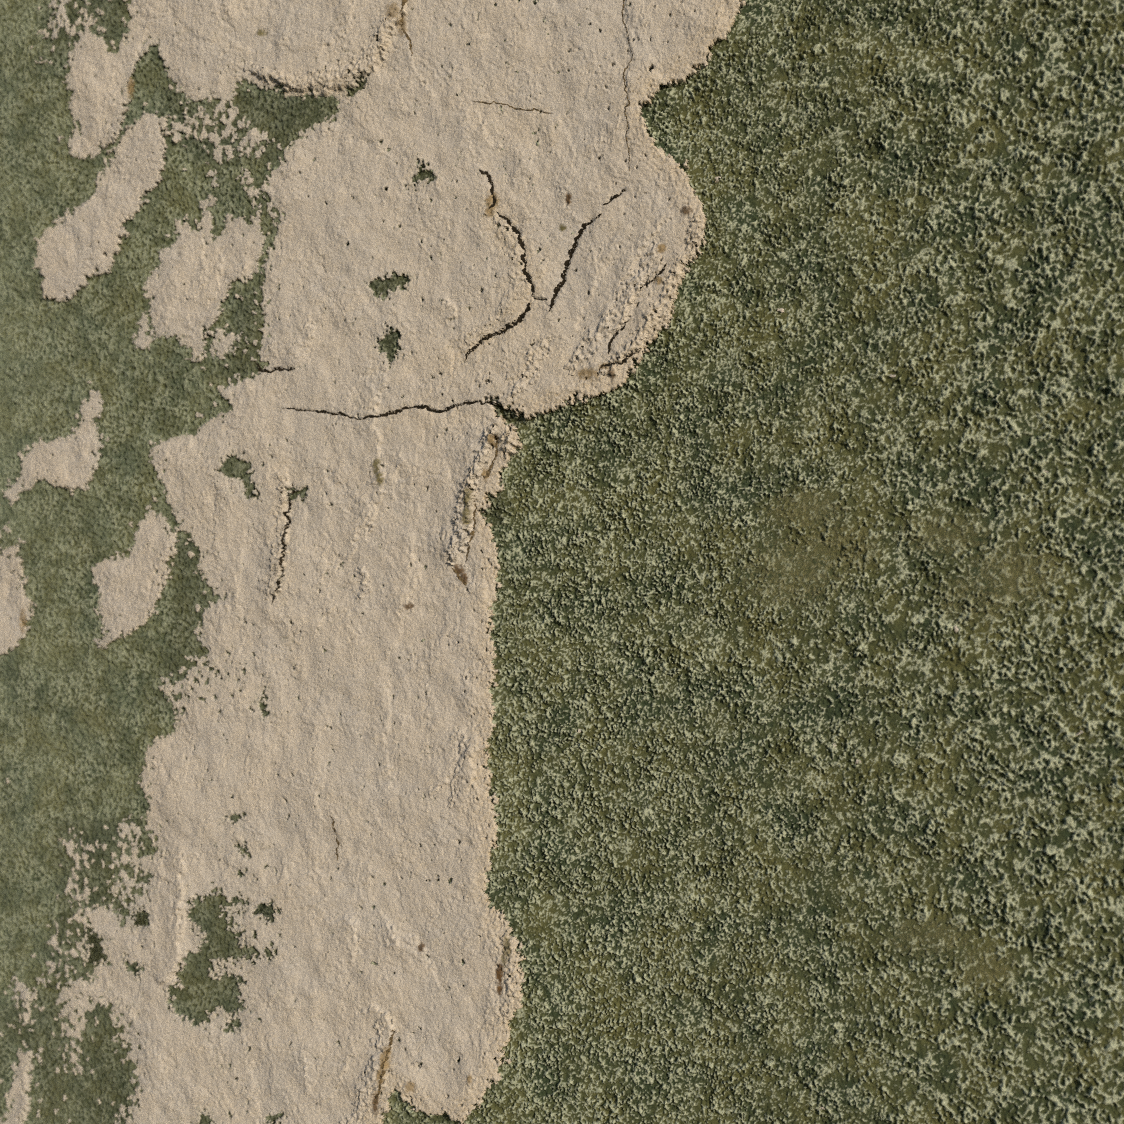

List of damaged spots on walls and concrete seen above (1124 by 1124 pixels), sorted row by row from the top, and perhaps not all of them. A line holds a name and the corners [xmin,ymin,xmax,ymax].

spalling [30,0,132,70]
spalling [155,75,367,388]
crack [465,0,633,359]
flaking render [2,389,104,506]
spalling [218,453,260,499]
crack [282,399,502,420]
crack [452,434,499,585]
flaking render [0,521,37,655]
spalling [147,523,246,715]
spalling [0,812,158,1124]
spalling [168,887,281,1033]
spalling [266,1112,287,1124]